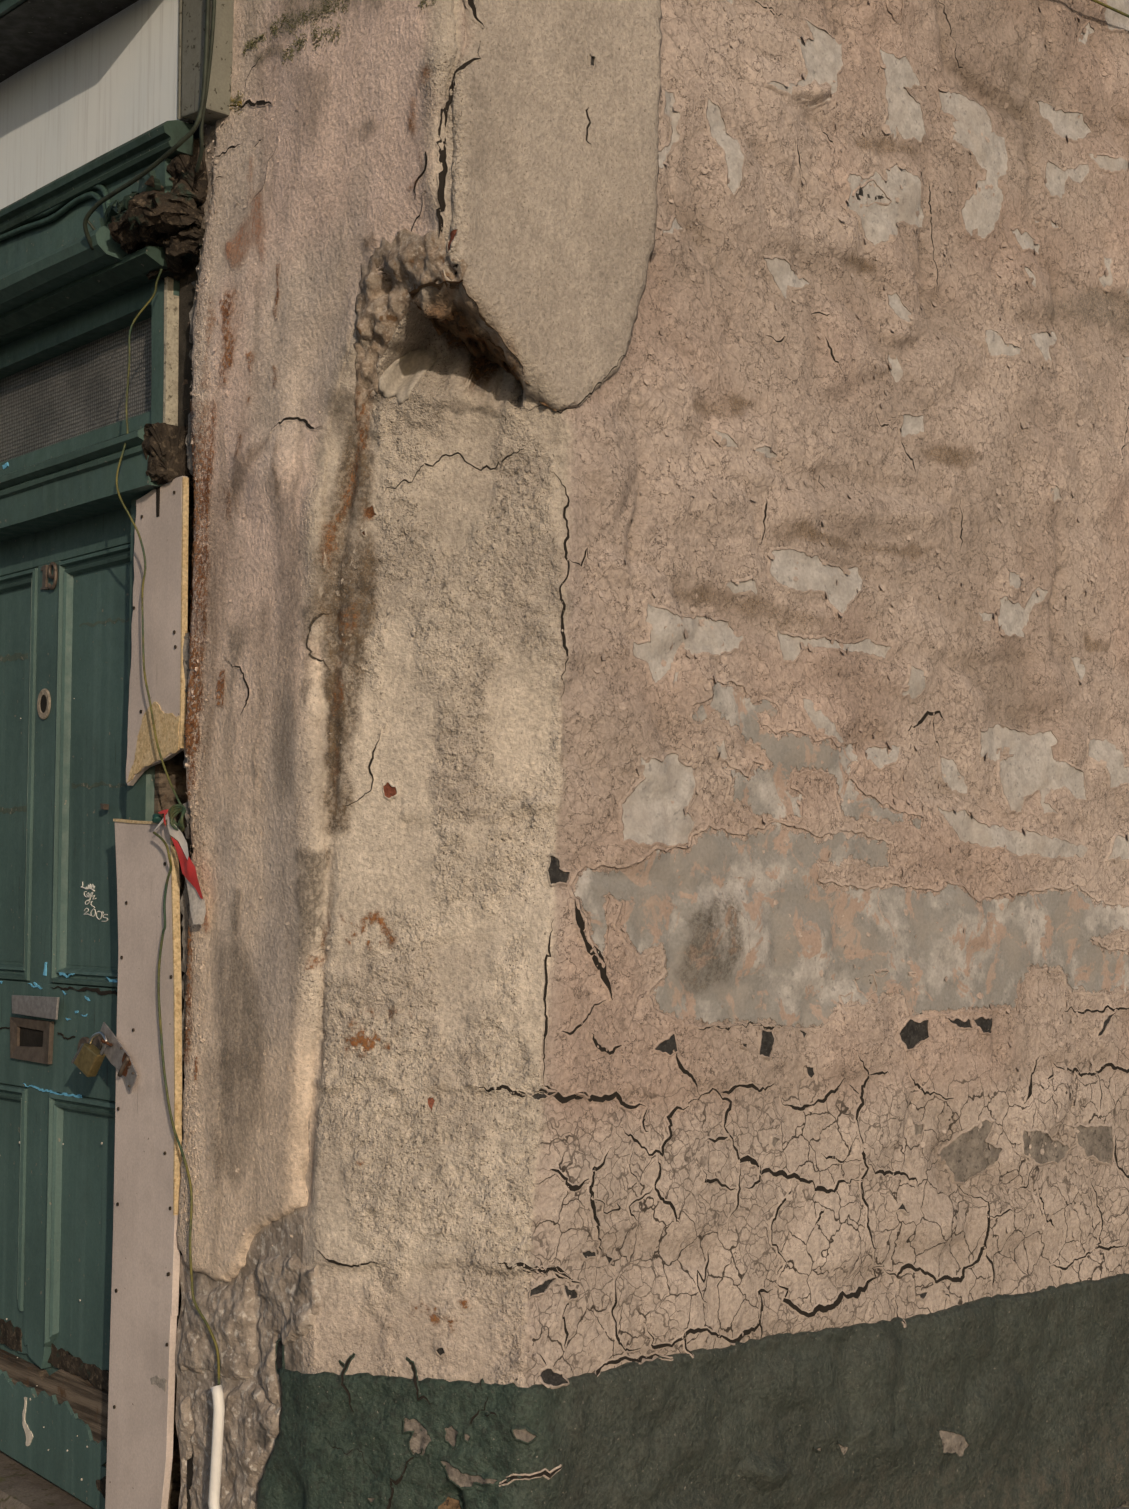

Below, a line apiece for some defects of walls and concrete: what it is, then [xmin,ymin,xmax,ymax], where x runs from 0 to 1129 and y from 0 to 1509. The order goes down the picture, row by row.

crack [410,0,485,239]
peeling [657,69,682,172]
peeling [701,94,769,199]
flaking render [185,120,258,903]
spalling [442,226,462,285]
peeling [624,329,783,534]
peeling [754,17,1129,684]
peeling [309,455,1129,1389]
crack [474,899,1129,1377]
spalling [275,1338,285,1375]
spalling [510,1425,539,1445]